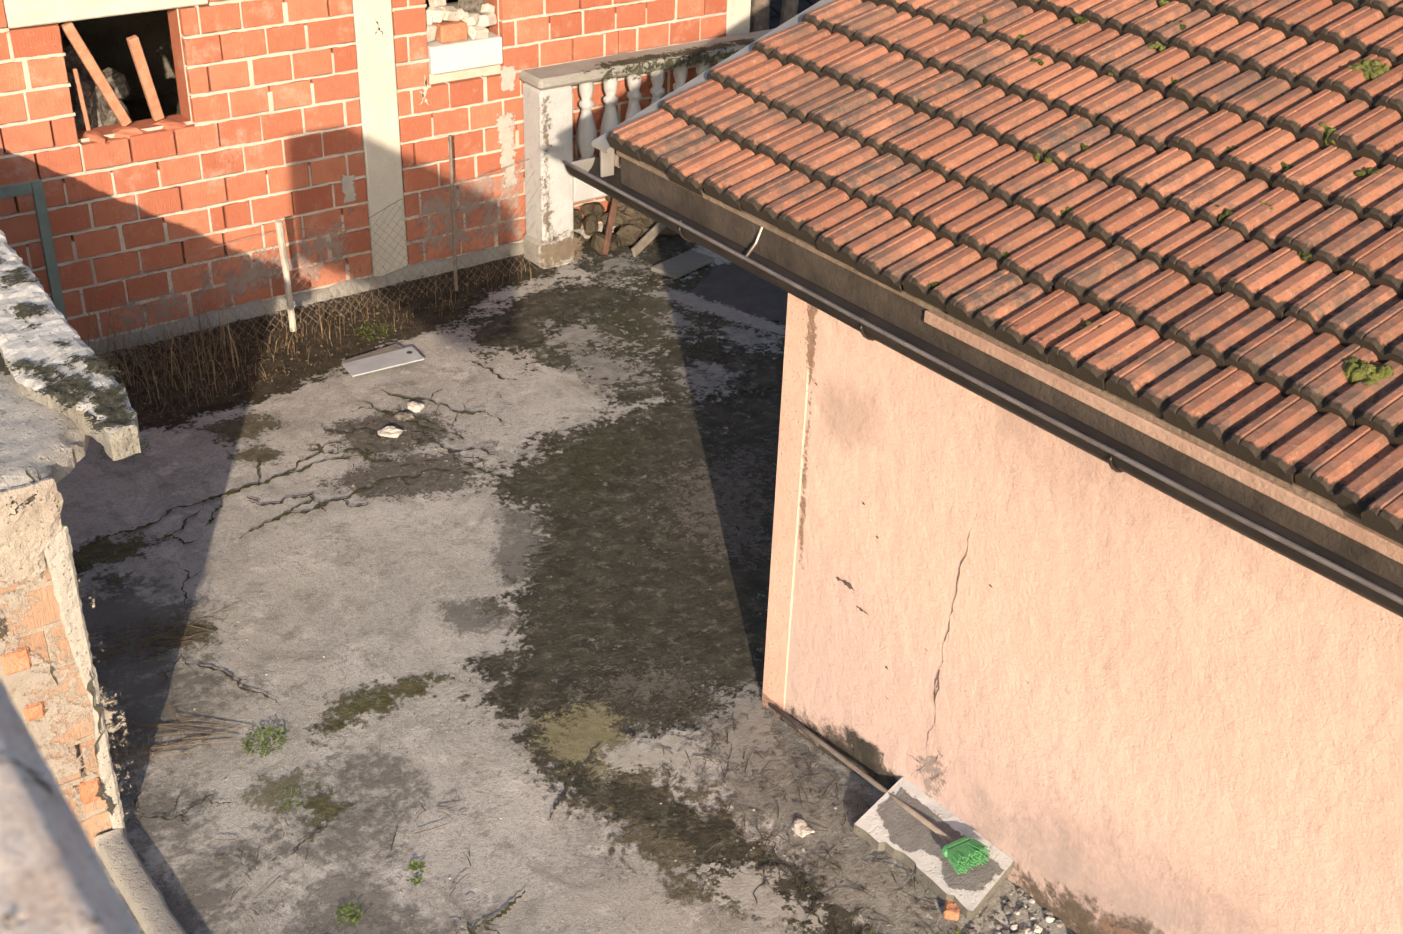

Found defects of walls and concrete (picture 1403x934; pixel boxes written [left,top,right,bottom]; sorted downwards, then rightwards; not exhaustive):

damp [491,510,544,587]
spalling [0,645,32,675]
crack [911,502,979,775]
spalling [23,701,45,722]
spalling [78,777,101,805]
damp [589,680,1001,934]
damp [1013,866,1164,934]